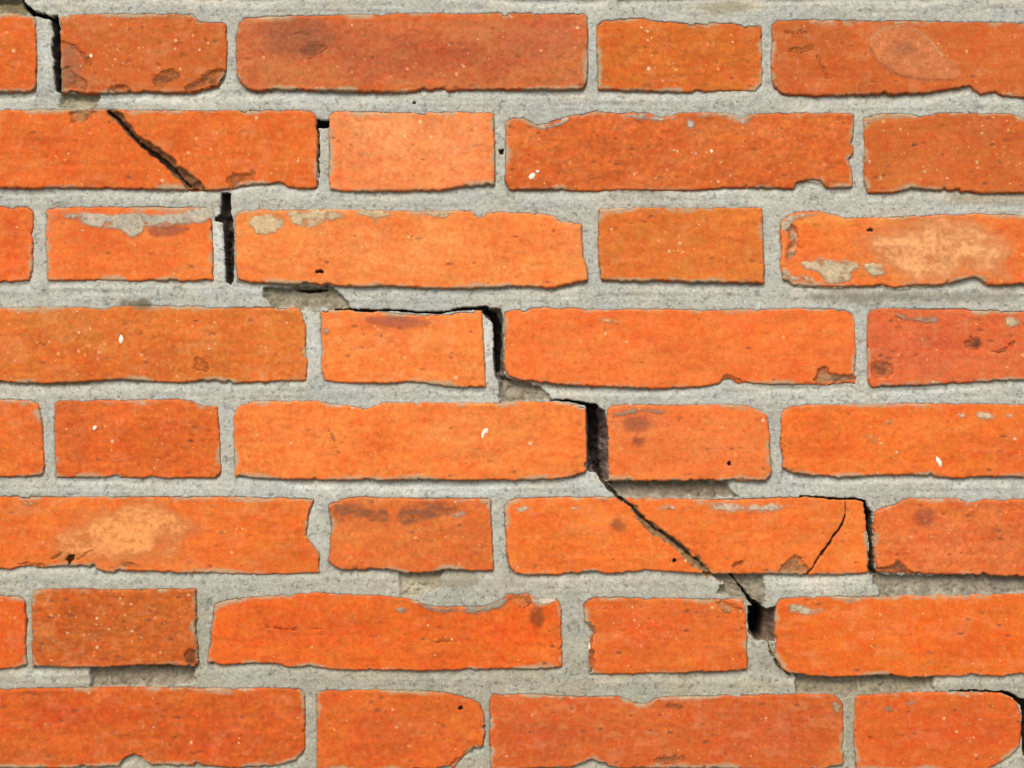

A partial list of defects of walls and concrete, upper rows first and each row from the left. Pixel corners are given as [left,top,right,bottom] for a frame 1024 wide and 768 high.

crack [26,4,63,94]
crack [314,126,322,188]
crack [107,110,235,285]
spalling [785,225,799,261]
peeling [262,285,351,312]
crack [300,290,511,381]
crack [552,399,791,675]
crack [799,495,877,574]
crack [953,689,1024,755]